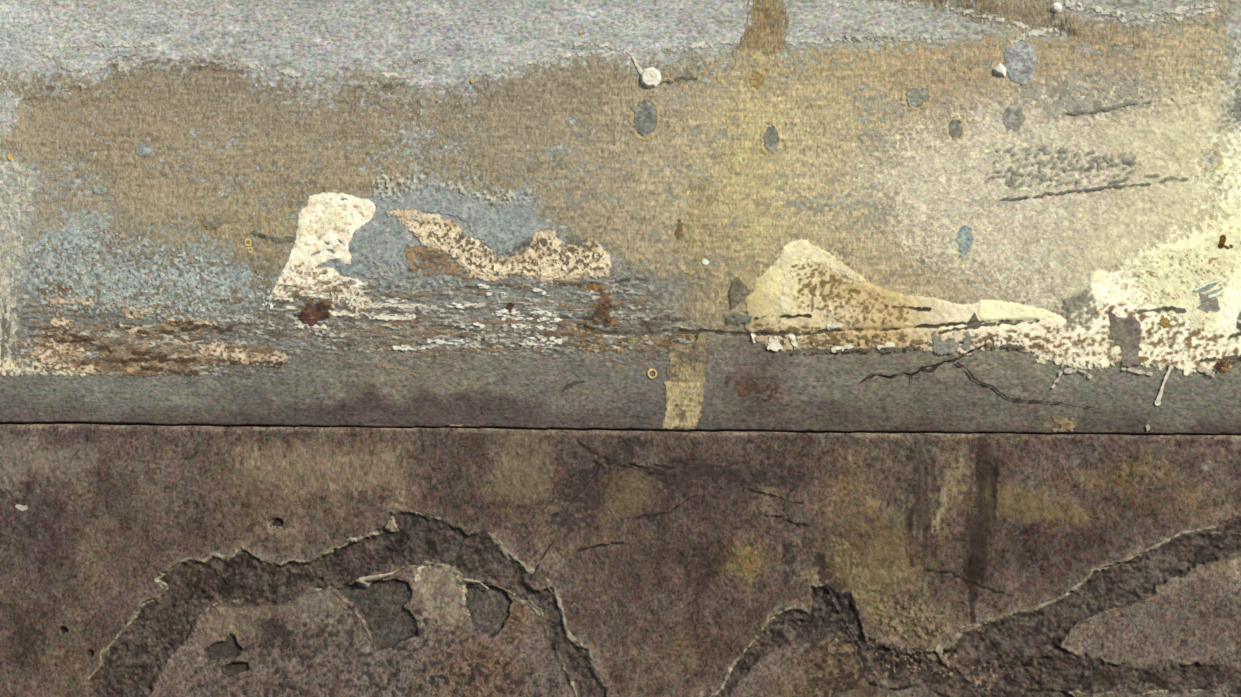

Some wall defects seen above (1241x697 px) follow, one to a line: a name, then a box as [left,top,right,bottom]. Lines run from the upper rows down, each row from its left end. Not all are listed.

peeling [0,173,612,378]
corrosion [294,297,336,325]
water stain [0,269,722,430]
peeling [726,239,1142,367]
crack [861,337,1099,409]
peeling [1193,280,1225,313]
spalling [85,511,608,697]
spalling [698,513,1241,697]
water stain [967,446,1085,621]